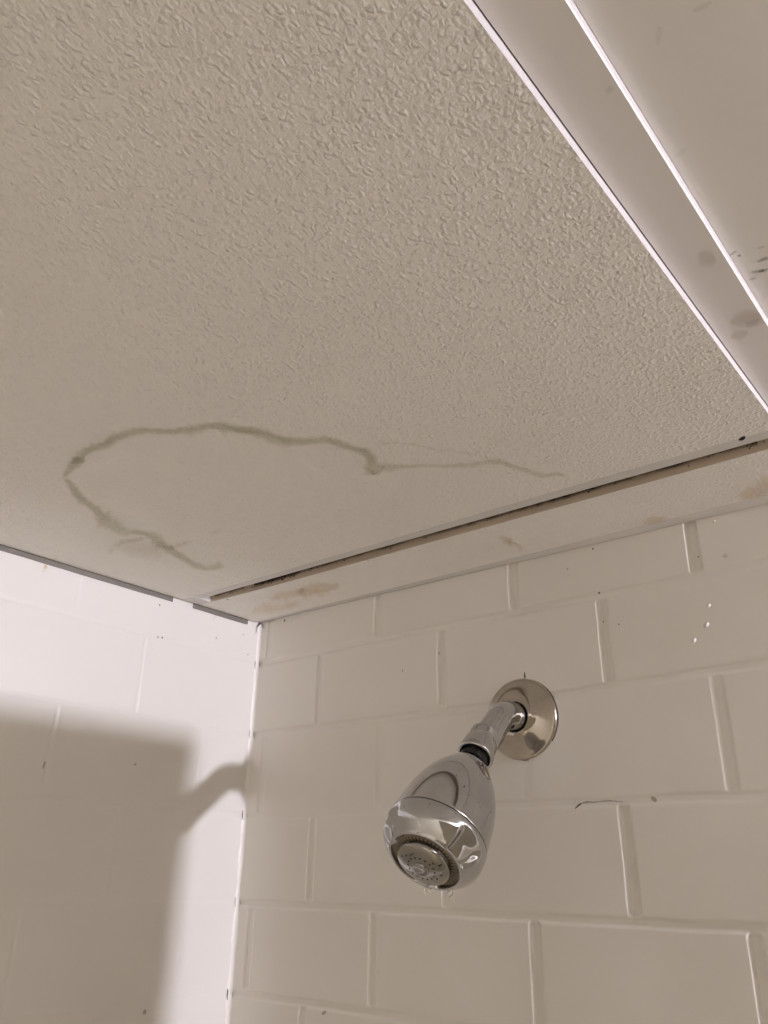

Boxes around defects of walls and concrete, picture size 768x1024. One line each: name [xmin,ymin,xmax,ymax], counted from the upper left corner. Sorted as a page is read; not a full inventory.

leakage [216,441,765,595]